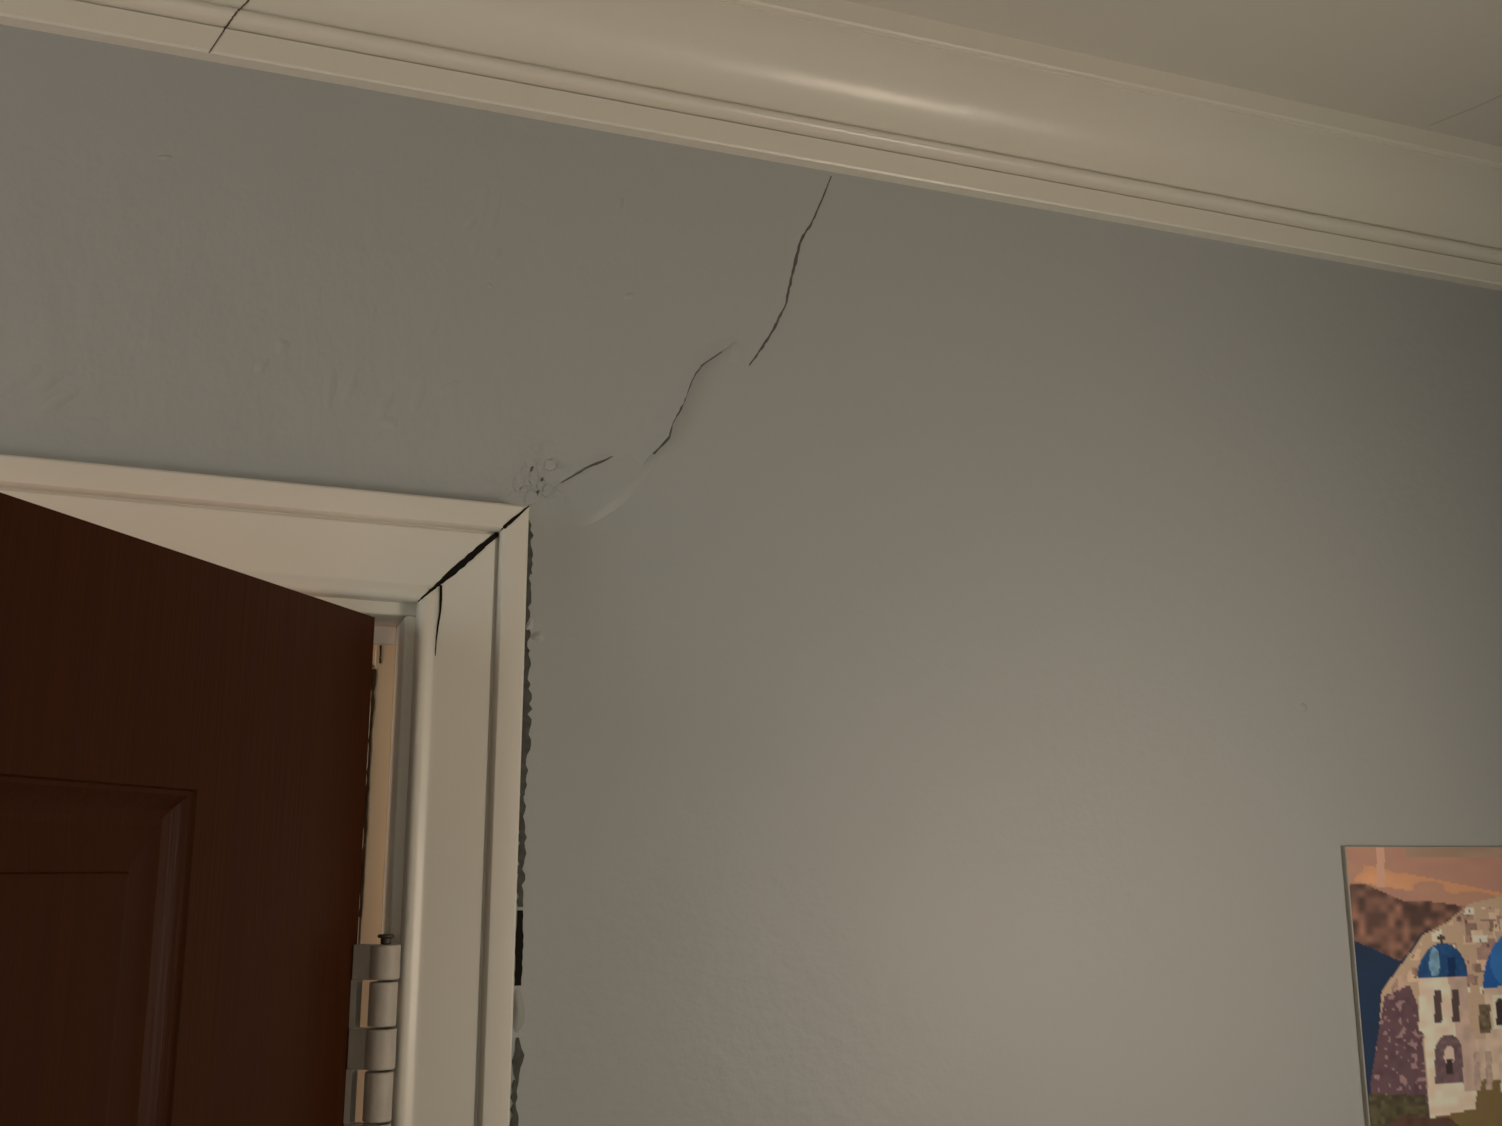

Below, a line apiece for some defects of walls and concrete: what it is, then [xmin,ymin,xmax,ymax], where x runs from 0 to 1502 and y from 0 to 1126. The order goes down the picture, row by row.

crack [208,0,250,53]
crack [746,175,832,366]